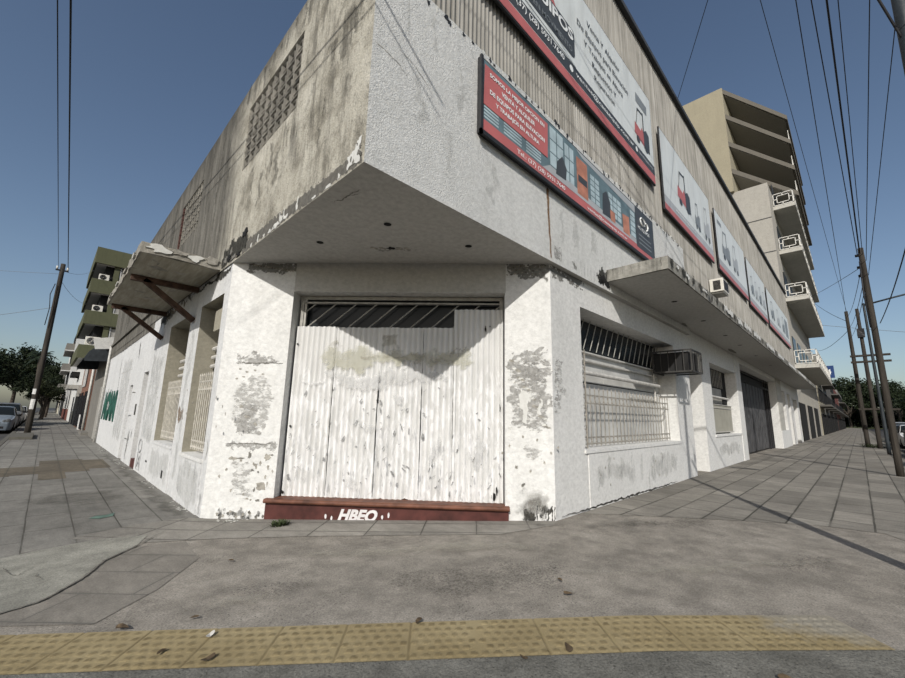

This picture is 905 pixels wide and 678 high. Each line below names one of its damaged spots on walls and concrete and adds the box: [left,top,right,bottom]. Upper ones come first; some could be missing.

peeling [347,135,362,170]
damp [242,151,362,254]
damp [246,263,297,275]
peeling [216,351,283,519]
peeling [506,347,563,441]
crack [0,527,171,613]